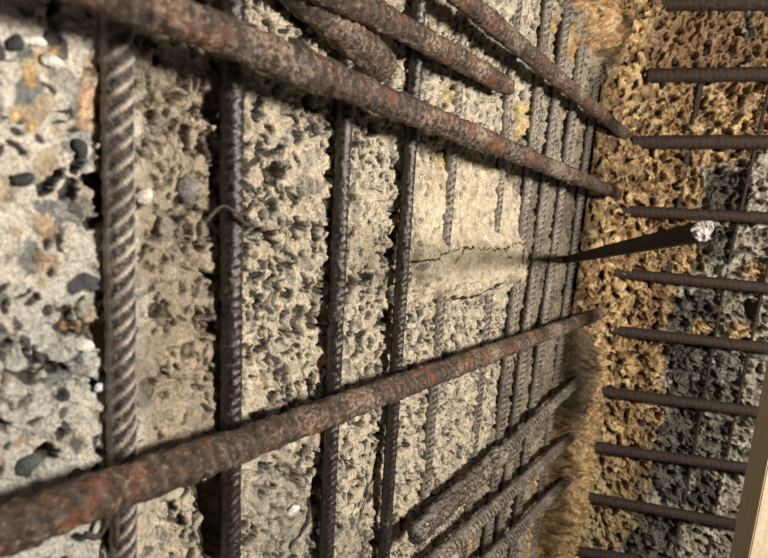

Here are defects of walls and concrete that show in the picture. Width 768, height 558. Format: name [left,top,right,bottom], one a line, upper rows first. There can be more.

corrosion [441,82,455,103]
corrosion [512,99,531,139]
corrosion [429,151,446,168]
corrosion [35,212,58,241]
spalling [63,0,768,468]
crack [410,242,524,305]
corrosion [522,0,768,558]
corrosion [58,314,94,334]
spalling [0,208,607,558]